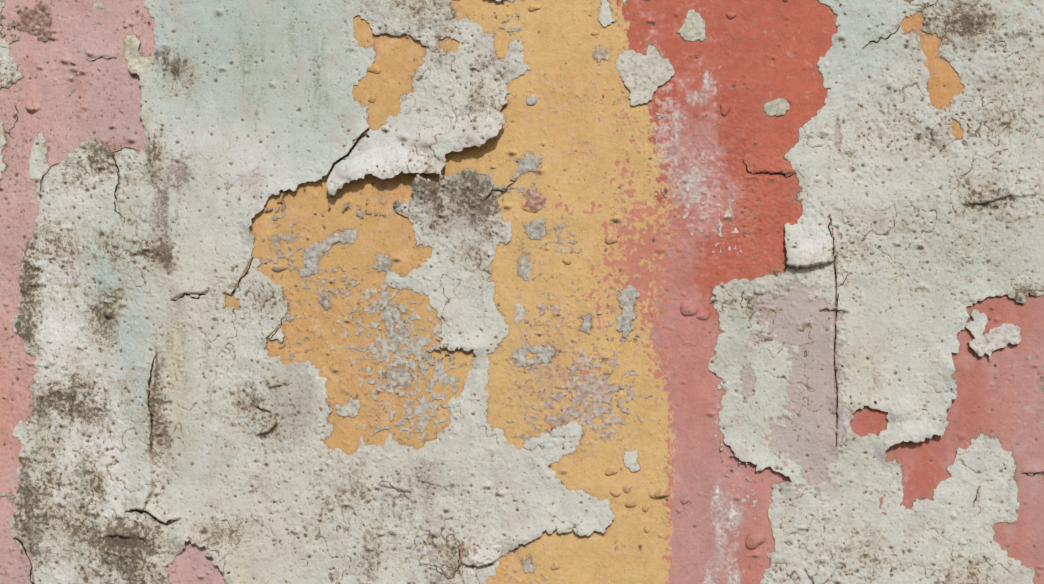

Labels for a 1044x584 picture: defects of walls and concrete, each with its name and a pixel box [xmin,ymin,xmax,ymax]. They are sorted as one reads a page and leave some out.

peeling [0,0,22,88]
peeling [615,45,675,106]
peeling [677,9,707,41]
peeling [9,0,616,584]
crack [821,216,848,441]
peeling [708,0,1044,584]
crack [148,354,157,448]
peeling [624,449,641,472]
crack [126,509,178,525]